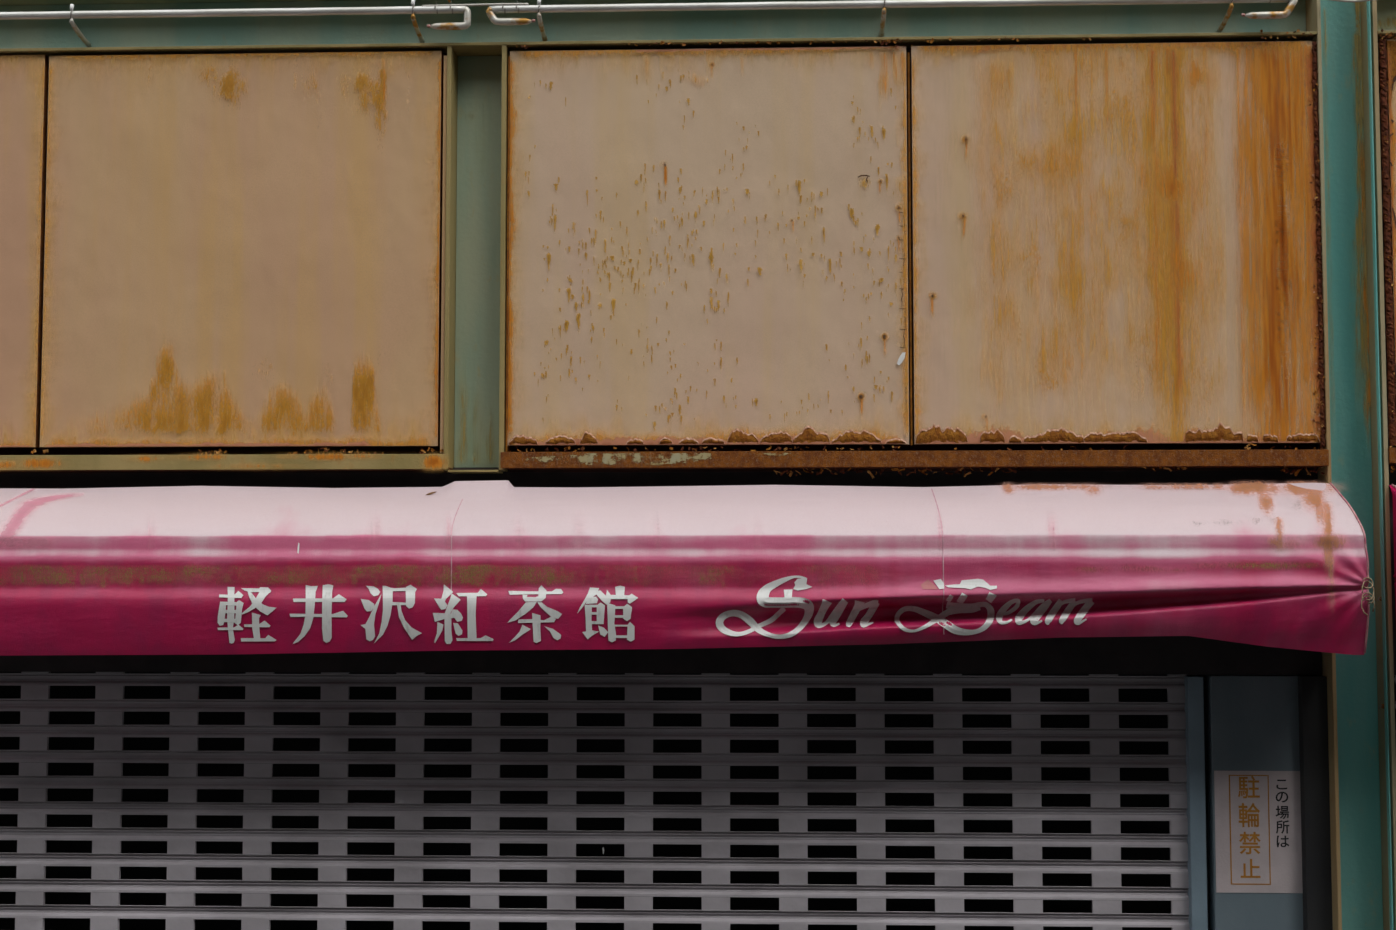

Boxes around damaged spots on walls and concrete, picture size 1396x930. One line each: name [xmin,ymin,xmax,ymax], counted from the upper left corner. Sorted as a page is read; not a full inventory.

rust [0,51,444,469]
rust [508,29,1326,447]
rust [1353,2,1396,445]